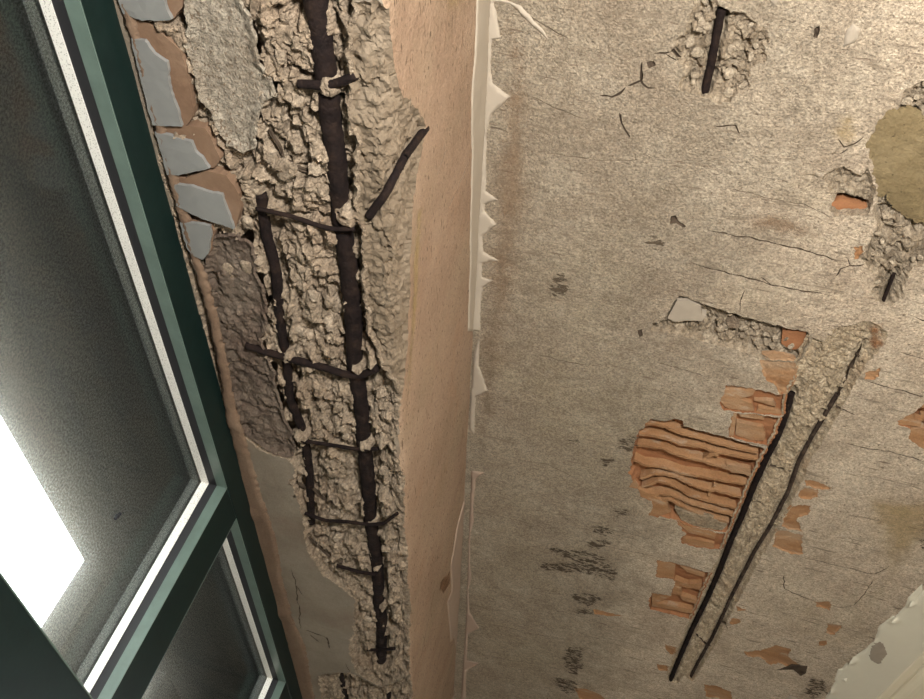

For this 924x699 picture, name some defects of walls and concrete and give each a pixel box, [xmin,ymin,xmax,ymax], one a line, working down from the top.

spalling [668,0,770,105]
spalling [118,0,426,699]
flaking render [447,471,483,699]
flaking render [468,0,548,434]
spalling [628,296,888,699]
crack [693,231,864,305]
spalling [798,81,924,306]
peeling [825,584,924,699]
crack [836,342,922,415]
spalling [898,404,924,449]